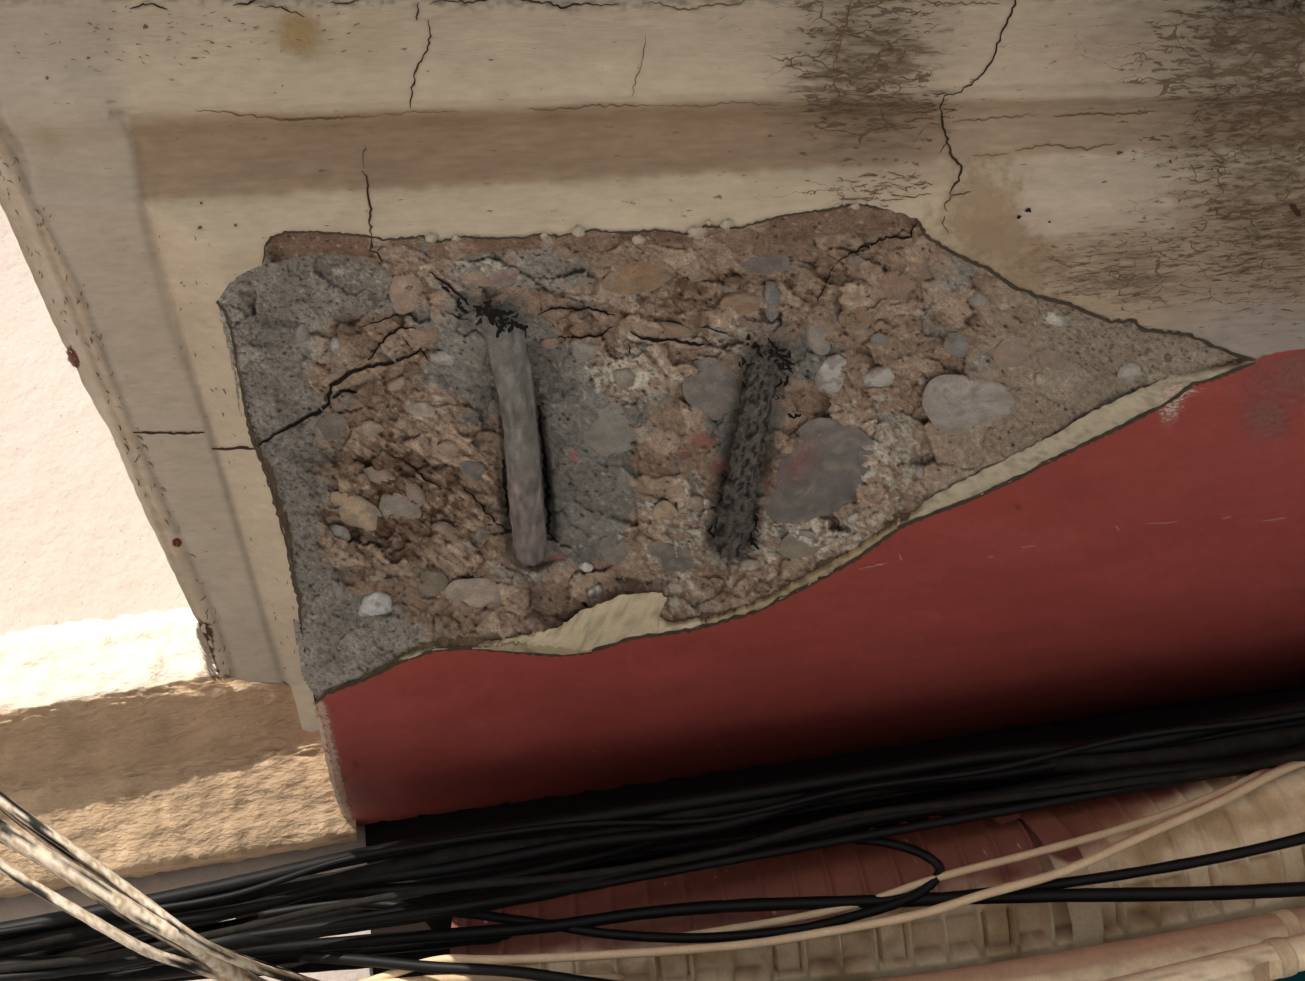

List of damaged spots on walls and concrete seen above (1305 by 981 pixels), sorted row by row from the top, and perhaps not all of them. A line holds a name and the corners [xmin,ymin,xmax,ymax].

crack [196,3,456,262]
damp [803,29,936,130]
crack [527,0,1305,312]
damp [1185,105,1305,288]
crack [133,271,472,451]
crack [391,455,509,531]
spalling [216,197,1257,825]